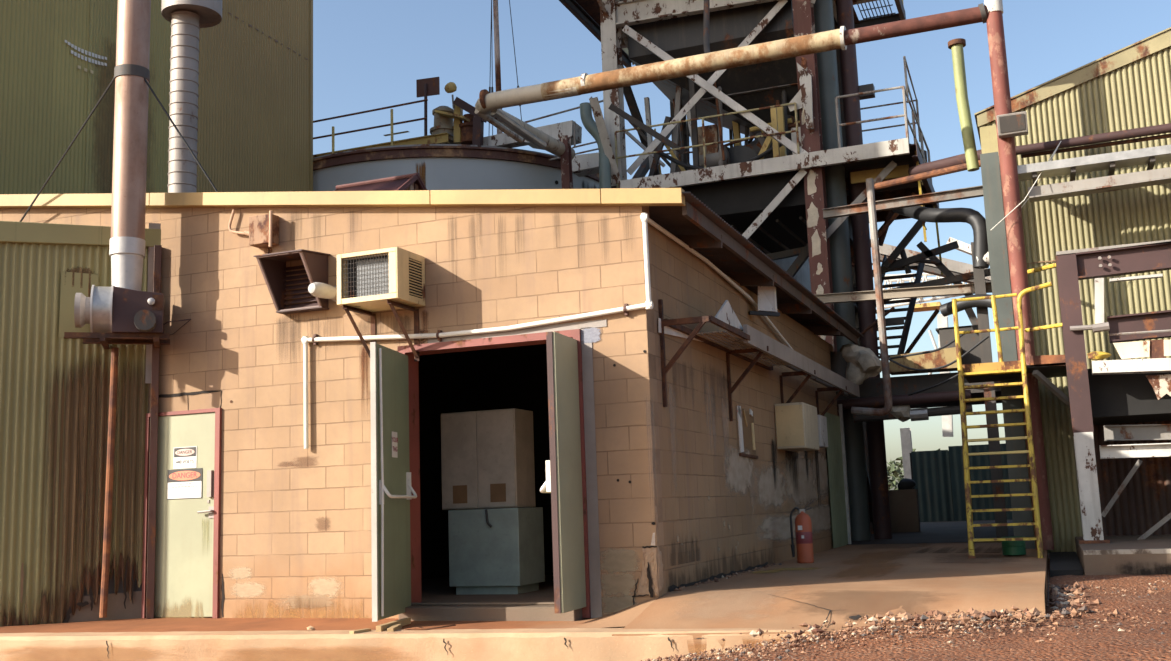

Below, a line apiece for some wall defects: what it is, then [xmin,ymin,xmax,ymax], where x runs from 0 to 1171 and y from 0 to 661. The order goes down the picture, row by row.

corrosion [3,539,138,627]